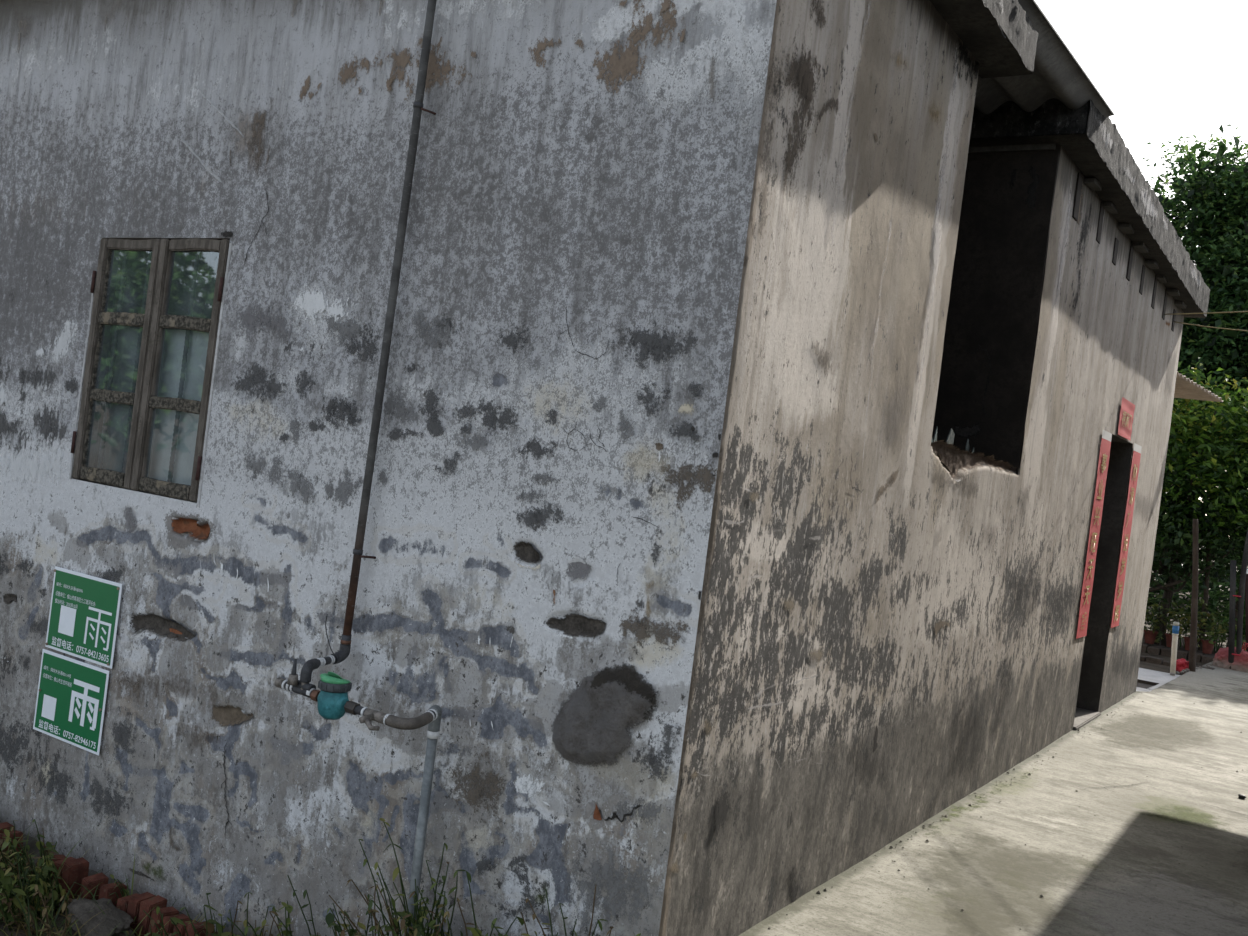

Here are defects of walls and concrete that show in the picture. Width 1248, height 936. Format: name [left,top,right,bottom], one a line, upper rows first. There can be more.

flaking render [337,37,476,102]
flaking render [528,0,695,102]
damp [247,101,272,170]
damp [777,32,852,205]
damp [97,559,124,582]
spalling [164,510,216,550]
spalling [513,541,541,570]
spalling [127,612,194,641]
spalling [543,613,606,640]
damp [0,710,42,779]
damp [39,757,133,826]
damp [446,747,550,828]